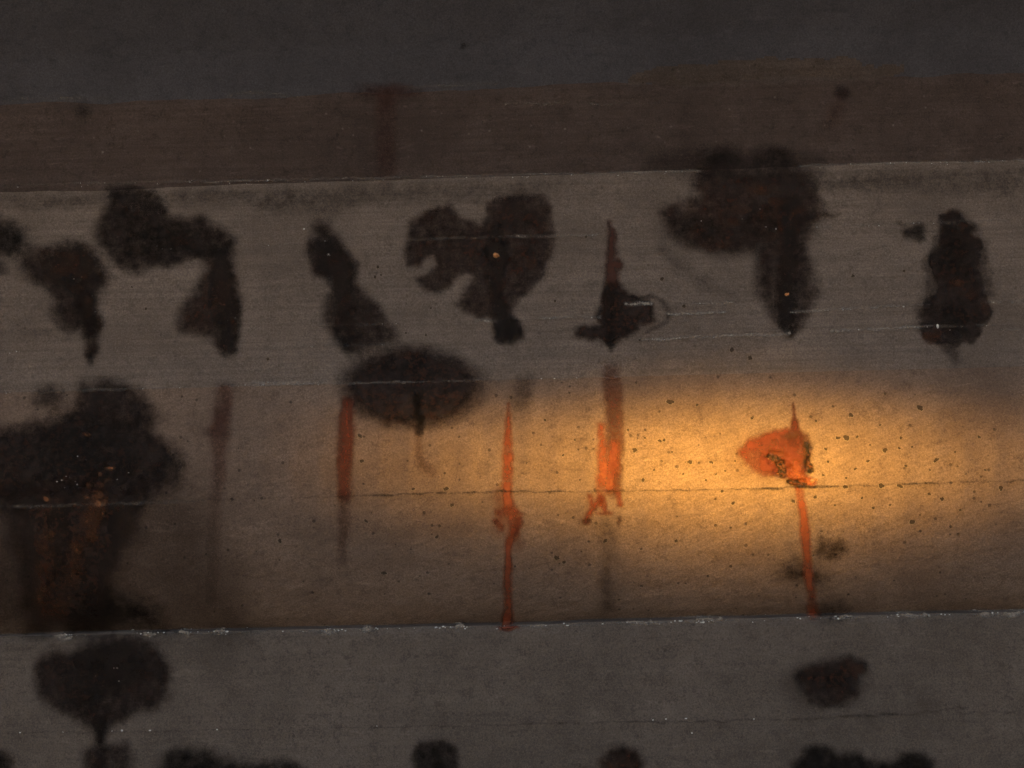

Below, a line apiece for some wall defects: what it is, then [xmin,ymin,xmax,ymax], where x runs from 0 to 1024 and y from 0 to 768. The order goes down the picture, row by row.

leakage [0,186,241,362]
leakage [303,222,482,435]
leakage [406,195,554,343]
leakage [661,151,832,337]
leakage [914,211,993,356]
leakage [0,380,184,768]
rust [337,399,353,507]
rust [494,403,522,630]
rust [583,366,624,524]
rust [739,404,819,619]
leakage [796,656,867,706]